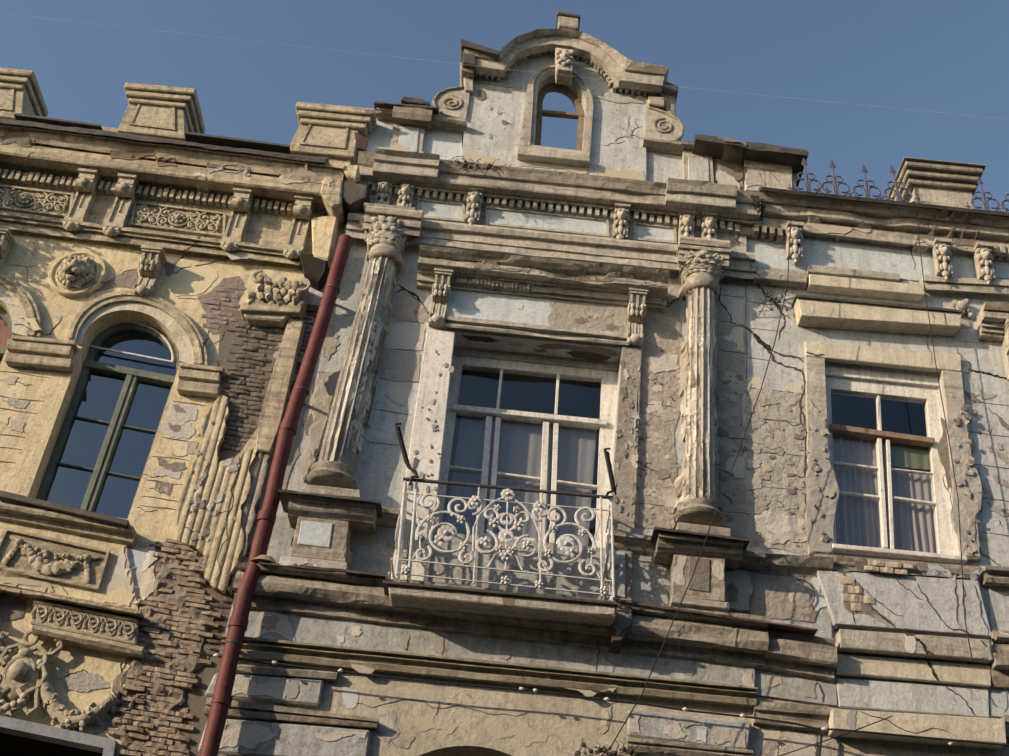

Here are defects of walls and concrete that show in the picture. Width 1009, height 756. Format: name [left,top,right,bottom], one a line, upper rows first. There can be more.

flaking render [165,257,285,452]
spalling [297,370,341,482]
spalling [548,262,980,653]
crack [718,145,825,514]
spalling [937,385,1009,557]
crack [956,348,1007,418]
spalling [279,555,321,571]
flaking render [60,538,238,756]
peeling [232,675,289,705]
crack [353,699,526,749]
crack [856,710,958,738]
crack [837,570,1008,716]